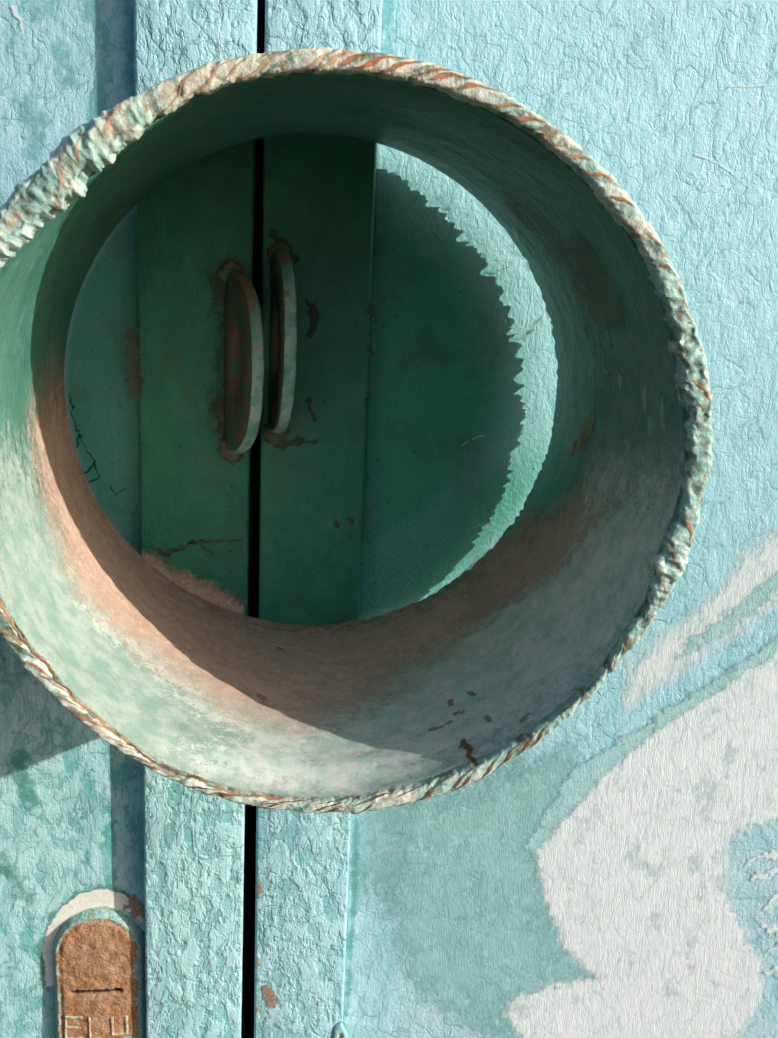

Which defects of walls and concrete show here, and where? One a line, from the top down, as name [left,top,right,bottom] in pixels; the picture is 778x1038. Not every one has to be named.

corrosion [152,49,547,123]
corrosion [57,132,85,193]
corrosion [546,140,611,179]
corrosion [676,342,712,424]
crack [69,393,126,496]
corrosion [32,368,600,733]
corrosion [560,562,668,715]
corrosion [0,600,548,814]
peeling [38,884,145,991]
corrosion [256,985,279,1014]